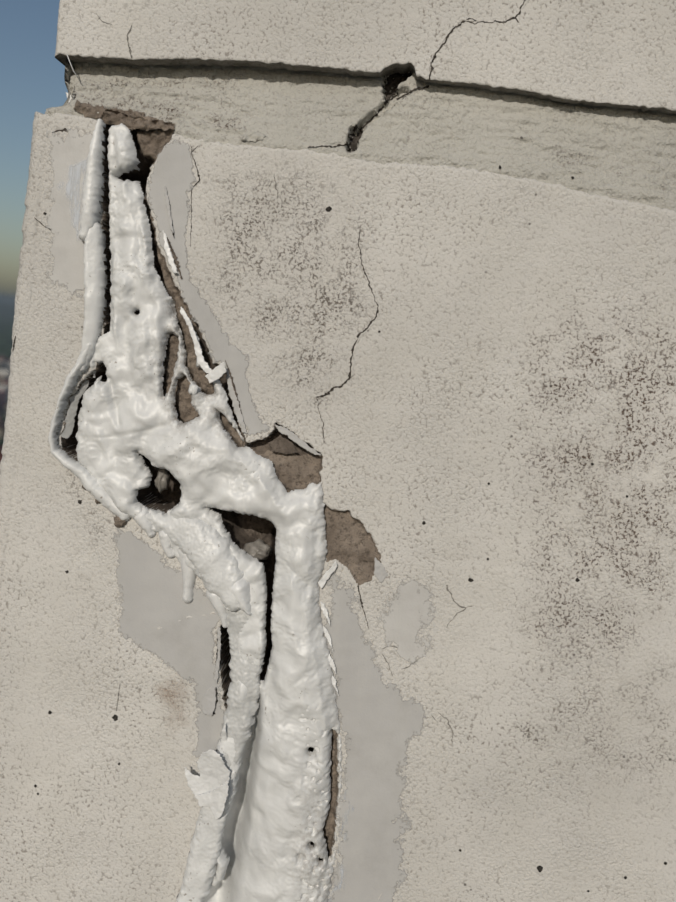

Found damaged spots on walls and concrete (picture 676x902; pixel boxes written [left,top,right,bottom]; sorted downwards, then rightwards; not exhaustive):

crack [426,0,530,80]
spalling [73,100,175,131]
crack [100,108,247,447]
crack [316,225,379,438]
crack [60,363,107,461]
crack [136,454,181,513]
spalling [244,423,323,492]
crack [210,508,276,680]
spalling [318,505,388,588]
crack [157,612,232,716]
peeling [184,724,230,820]
crack [308,729,339,861]